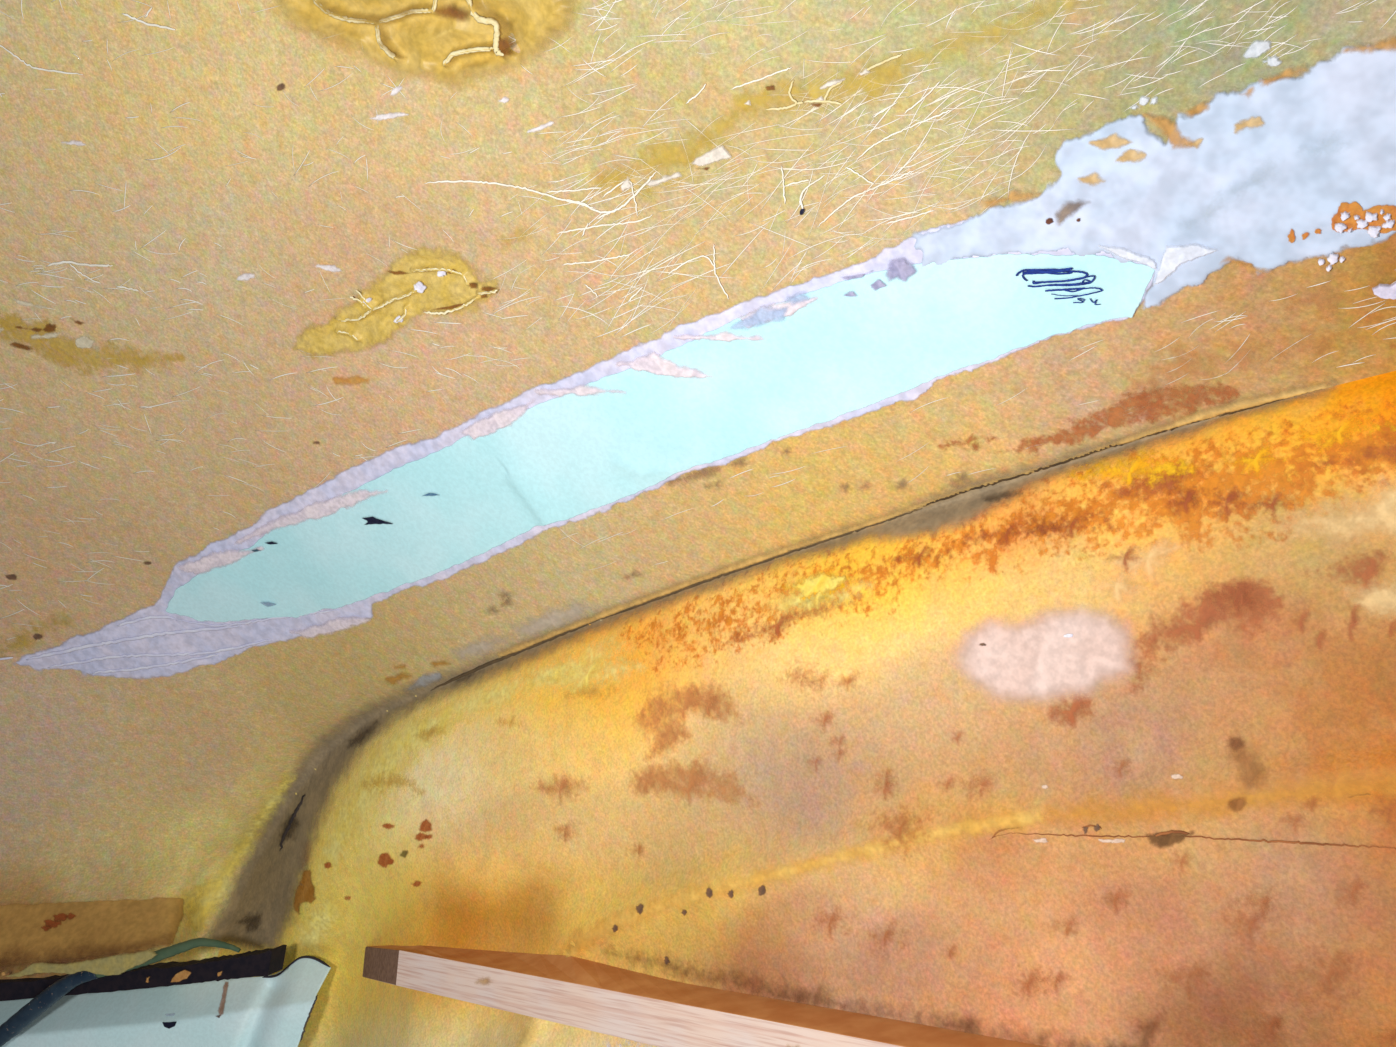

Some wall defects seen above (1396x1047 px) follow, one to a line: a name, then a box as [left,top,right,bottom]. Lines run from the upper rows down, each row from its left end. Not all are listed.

spalling [1288,202,1396,243]
leakage [0,299,183,373]
peeling [0,217,1154,679]
rust [1019,384,1238,451]
rust [622,417,1396,671]
peeling [1297,491,1396,538]
peeling [1358,586,1396,614]
peeling [960,611,1127,699]
rust [642,687,730,749]
leakage [181,777,292,930]
rust [378,820,432,867]
crack [989,825,1396,850]